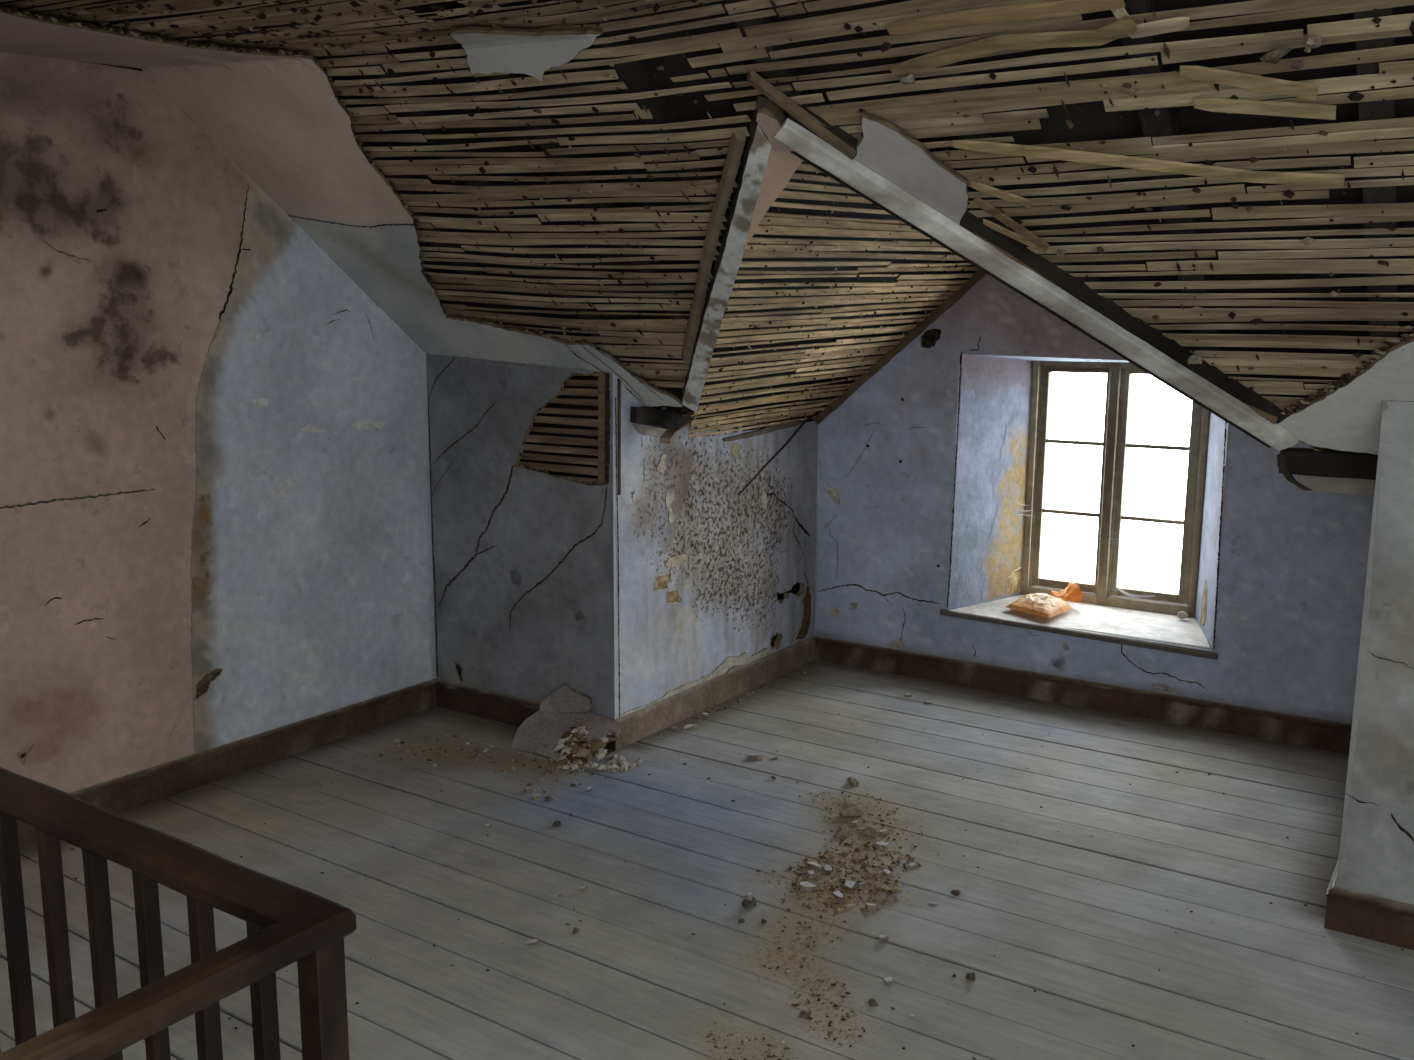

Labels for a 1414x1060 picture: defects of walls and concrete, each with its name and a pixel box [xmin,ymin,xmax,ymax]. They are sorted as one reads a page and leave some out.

leakage [0,51,201,400]
crack [210,183,251,346]
crack [288,215,418,228]
flaking render [0,0,1414,495]
crack [0,489,156,527]
crack [428,356,514,676]
crack [509,342,663,716]
peeling [654,554,689,604]
crack [767,336,981,639]
crack [1121,644,1208,691]
crack [1213,421,1227,650]
crack [1346,793,1414,842]